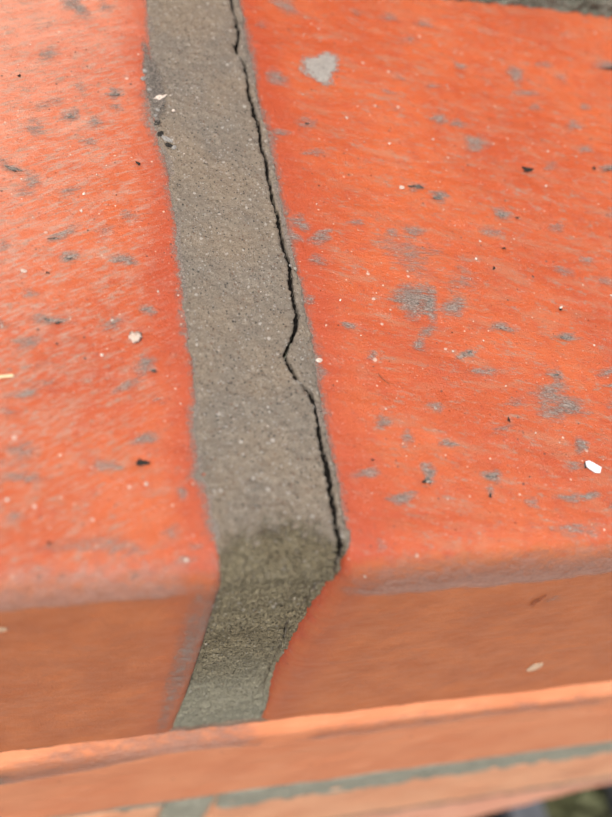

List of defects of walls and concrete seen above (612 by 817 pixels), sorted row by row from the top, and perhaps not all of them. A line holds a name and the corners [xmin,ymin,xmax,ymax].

crack [230,0,343,566]